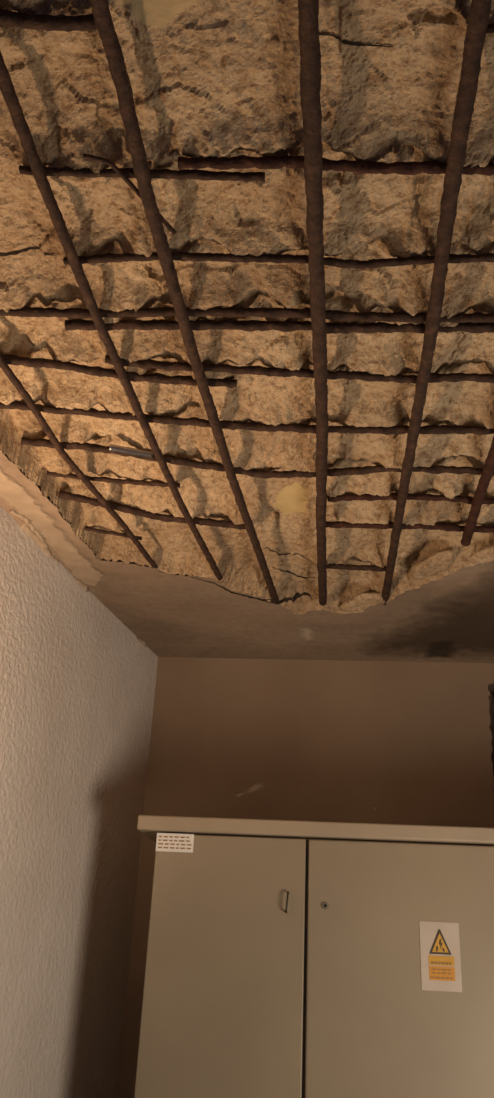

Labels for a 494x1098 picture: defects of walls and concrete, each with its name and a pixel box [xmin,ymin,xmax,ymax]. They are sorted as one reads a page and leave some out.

spalling [0,0,494,615]